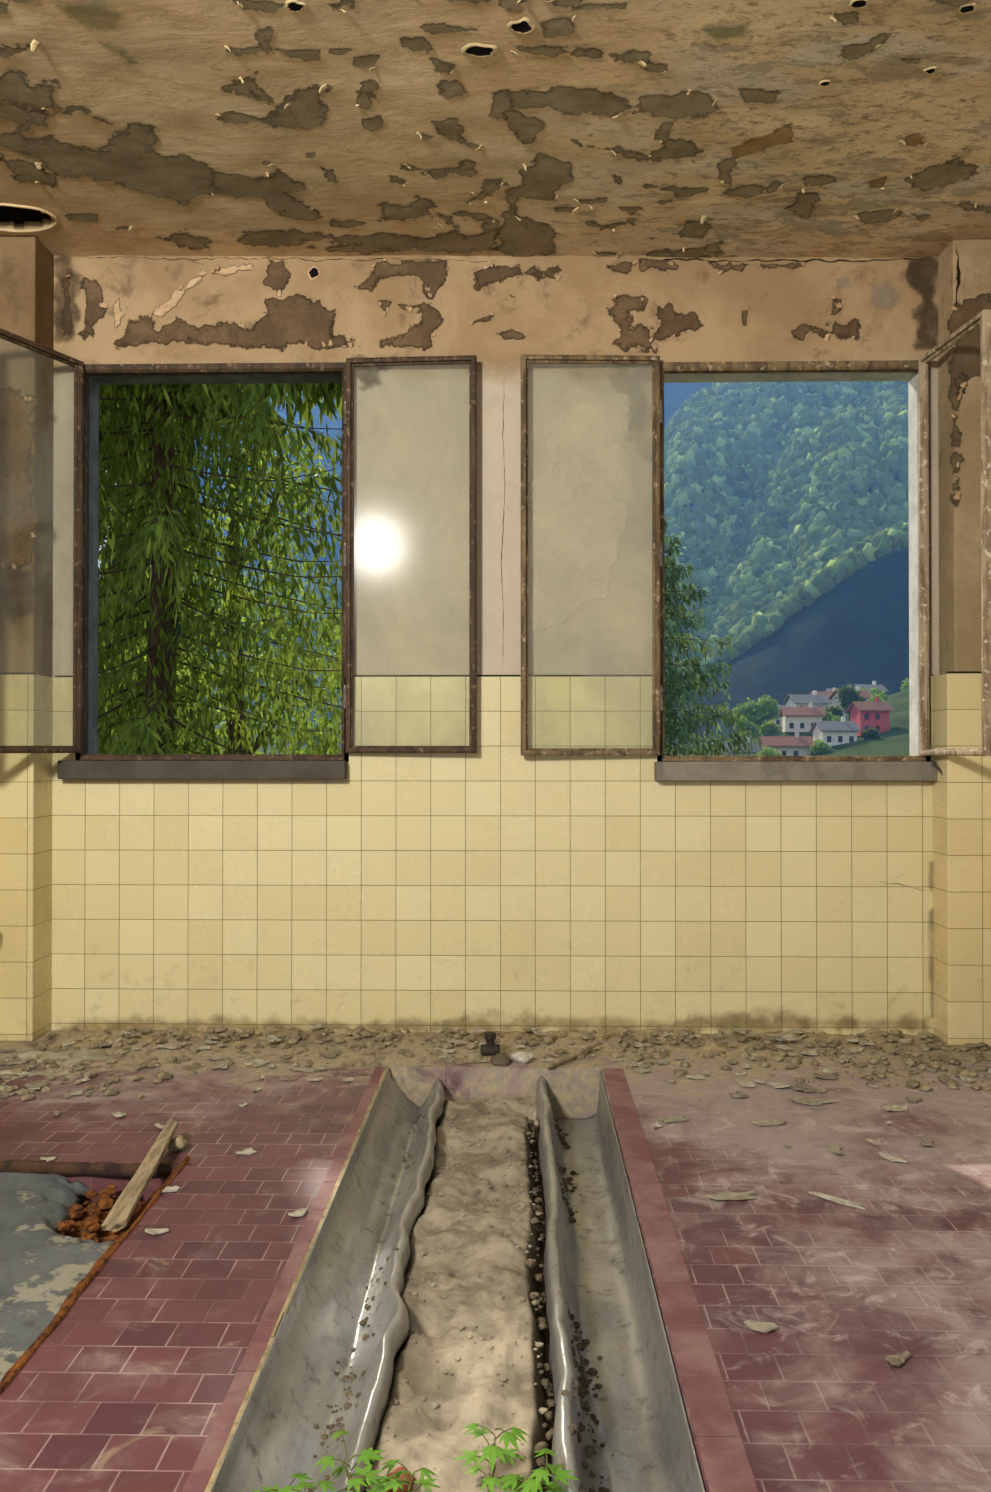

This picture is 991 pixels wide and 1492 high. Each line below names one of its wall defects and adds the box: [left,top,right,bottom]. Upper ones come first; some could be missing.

peeling [925,0,977,15]
peeling [400,0,668,99]
peeling [898,134,932,148]
peeling [904,155,980,191]
peeling [868,177,886,189]
peeling [0,39,838,354]
peeling [959,203,991,213]
peeling [854,209,930,224]